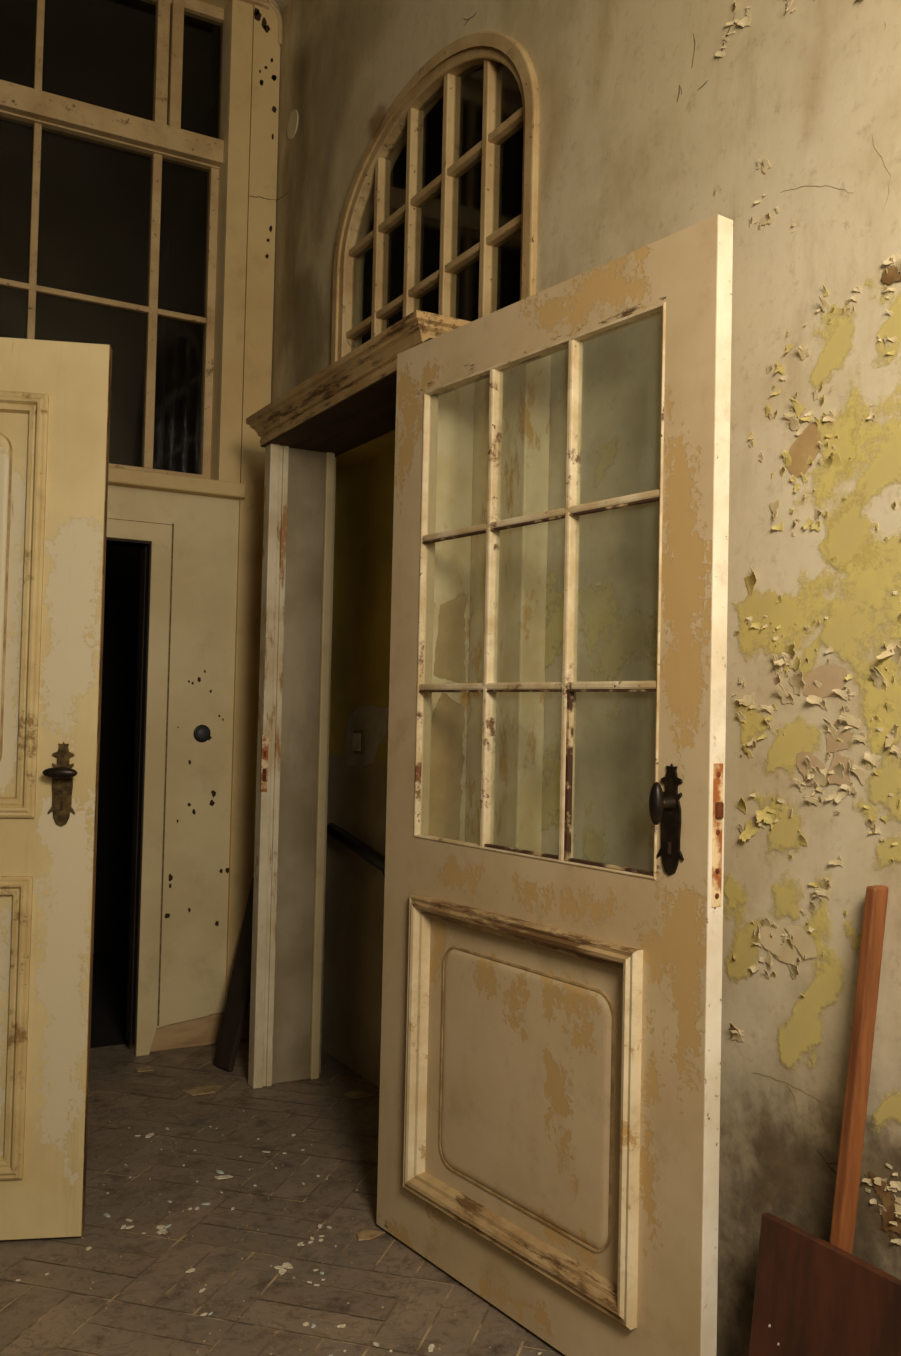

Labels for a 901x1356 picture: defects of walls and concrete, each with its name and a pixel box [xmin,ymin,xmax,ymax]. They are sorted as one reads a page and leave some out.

peeling [715,0,751,57]
peeling [732,252,901,869]
peeling [723,855,861,1068]
flaking render [862,1163,901,1246]